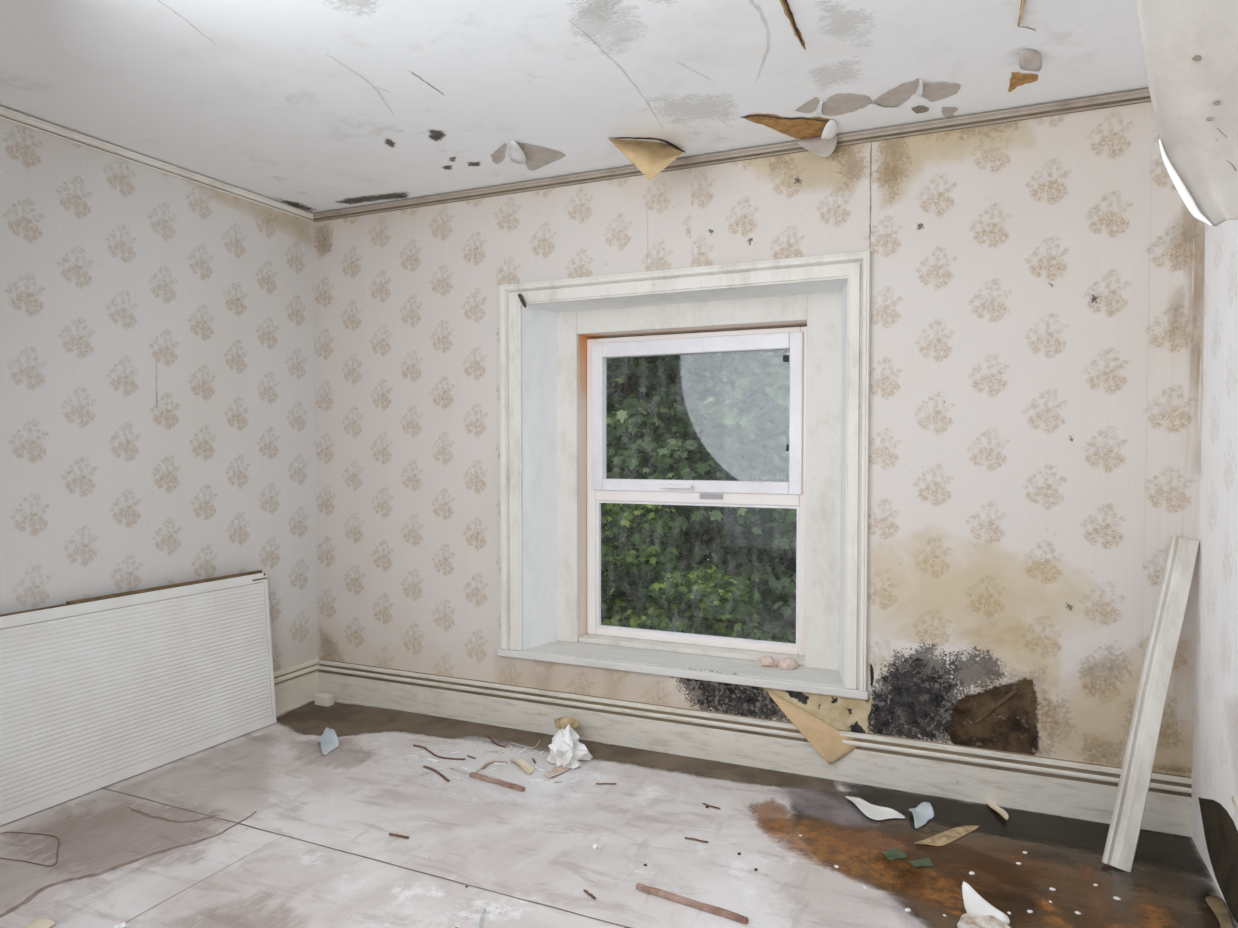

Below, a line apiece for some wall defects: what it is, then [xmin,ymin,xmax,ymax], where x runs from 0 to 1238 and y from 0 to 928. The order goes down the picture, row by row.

peeling [740,78,961,158]
water stain [276,700,555,752]
water stain [670,669,789,722]
water stain [785,642,1039,755]
water stain [579,739,1235,928]